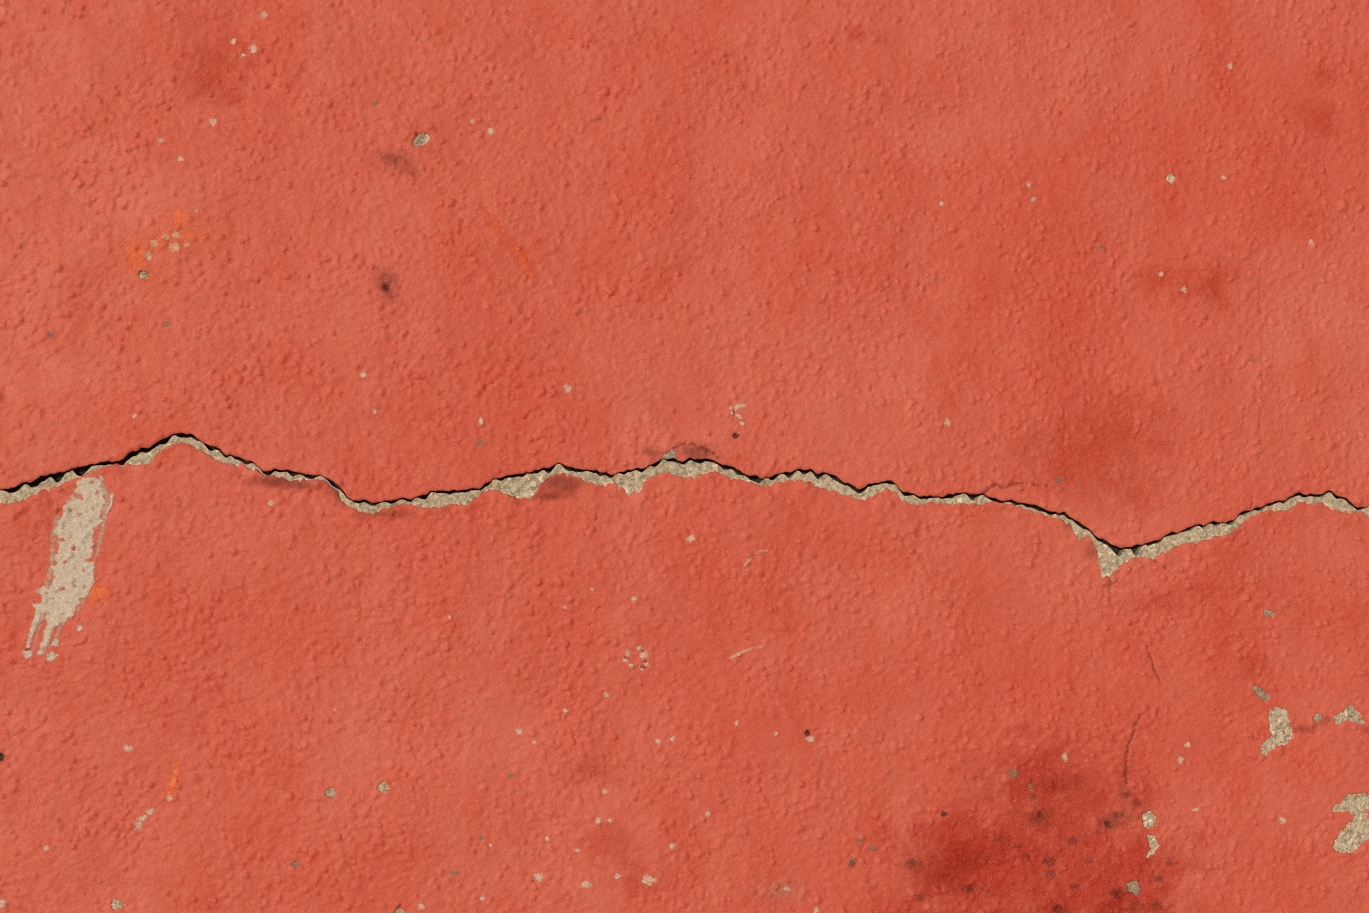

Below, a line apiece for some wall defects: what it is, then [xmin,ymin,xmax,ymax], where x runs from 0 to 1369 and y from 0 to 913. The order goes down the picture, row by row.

crack [0,433,1369,578]
peeling [1253,686,1294,756]
peeling [1313,705,1365,725]
peeling [1331,792,1369,854]